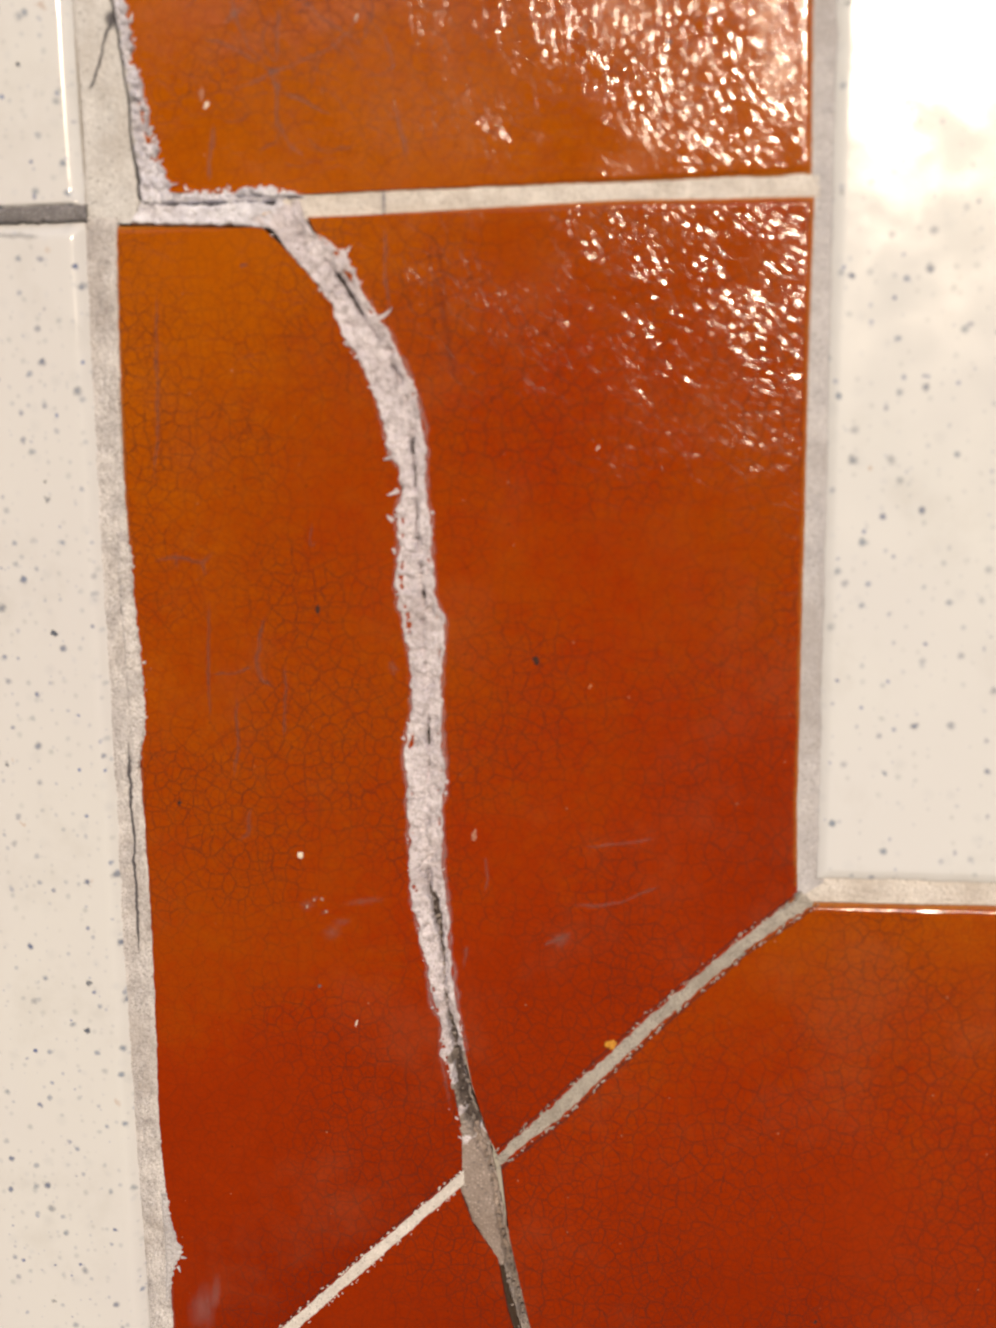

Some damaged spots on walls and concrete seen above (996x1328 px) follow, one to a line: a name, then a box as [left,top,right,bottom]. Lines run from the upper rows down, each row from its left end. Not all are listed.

crack [90,0,530,1328]